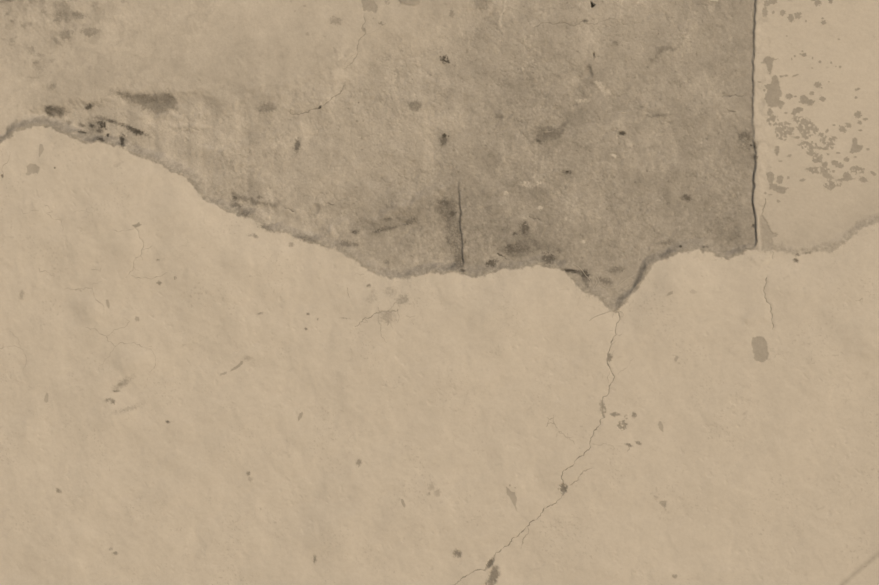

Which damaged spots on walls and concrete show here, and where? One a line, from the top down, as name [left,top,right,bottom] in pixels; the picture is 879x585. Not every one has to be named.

spalling [0,0,879,313]
crack [454,312,633,585]